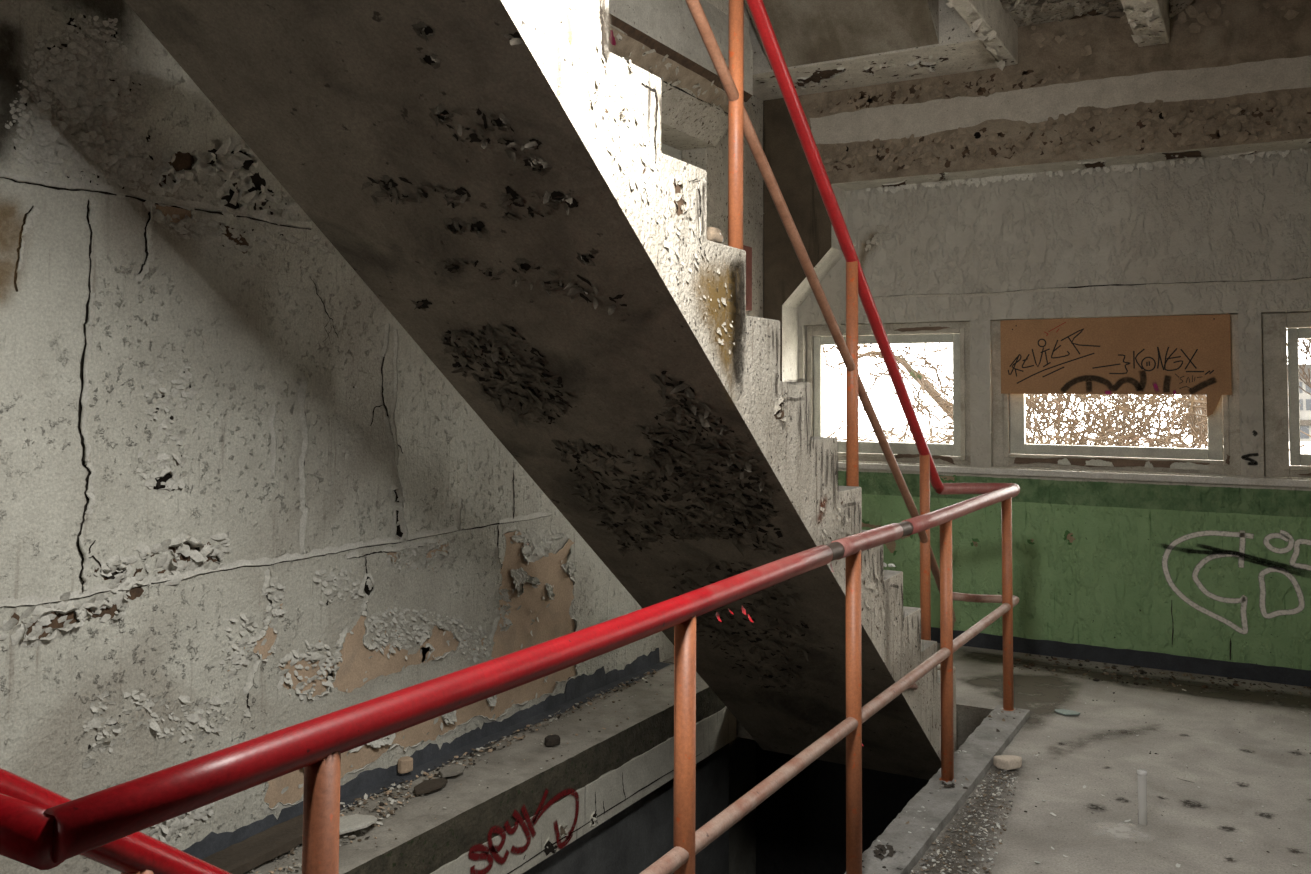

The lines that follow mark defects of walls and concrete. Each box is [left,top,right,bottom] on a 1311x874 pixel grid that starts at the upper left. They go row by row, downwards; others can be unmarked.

peeling [792,0,1311,144]
spalling [150,136,300,254]
peeling [361,175,488,238]
peeling [429,103,578,221]
peeling [440,253,627,315]
crack [0,169,553,616]
peeling [441,323,573,427]
spalling [773,393,787,426]
peeling [551,371,784,596]
peeling [219,525,578,705]
peeling [340,664,578,781]
peeling [263,768,304,814]